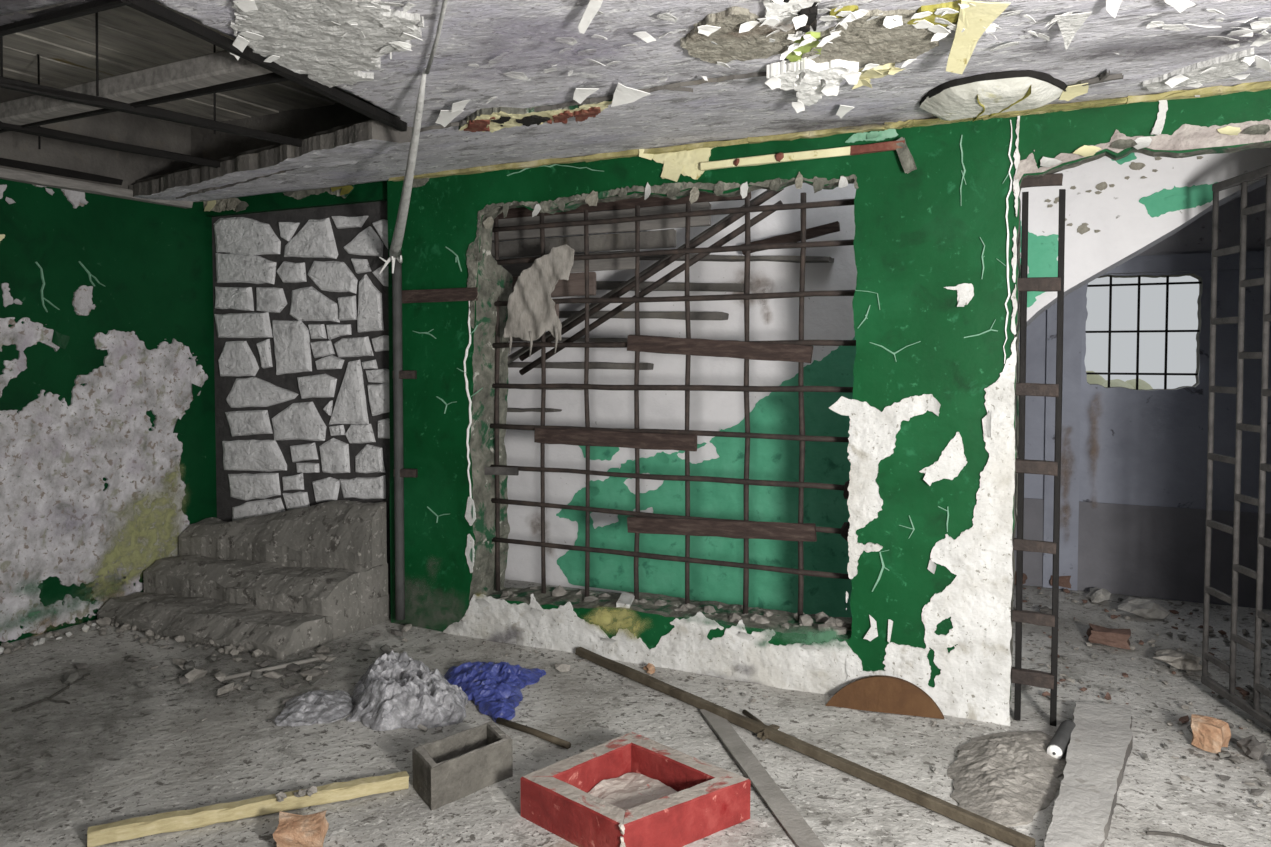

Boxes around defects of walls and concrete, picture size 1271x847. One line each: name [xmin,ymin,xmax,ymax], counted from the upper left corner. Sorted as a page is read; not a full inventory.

flaking render [230,0,424,88]
peeling [0,185,16,204]
peeling [32,184,88,208]
spalling [282,185,354,200]
peeling [435,0,1271,726]
peeling [0,283,208,643]